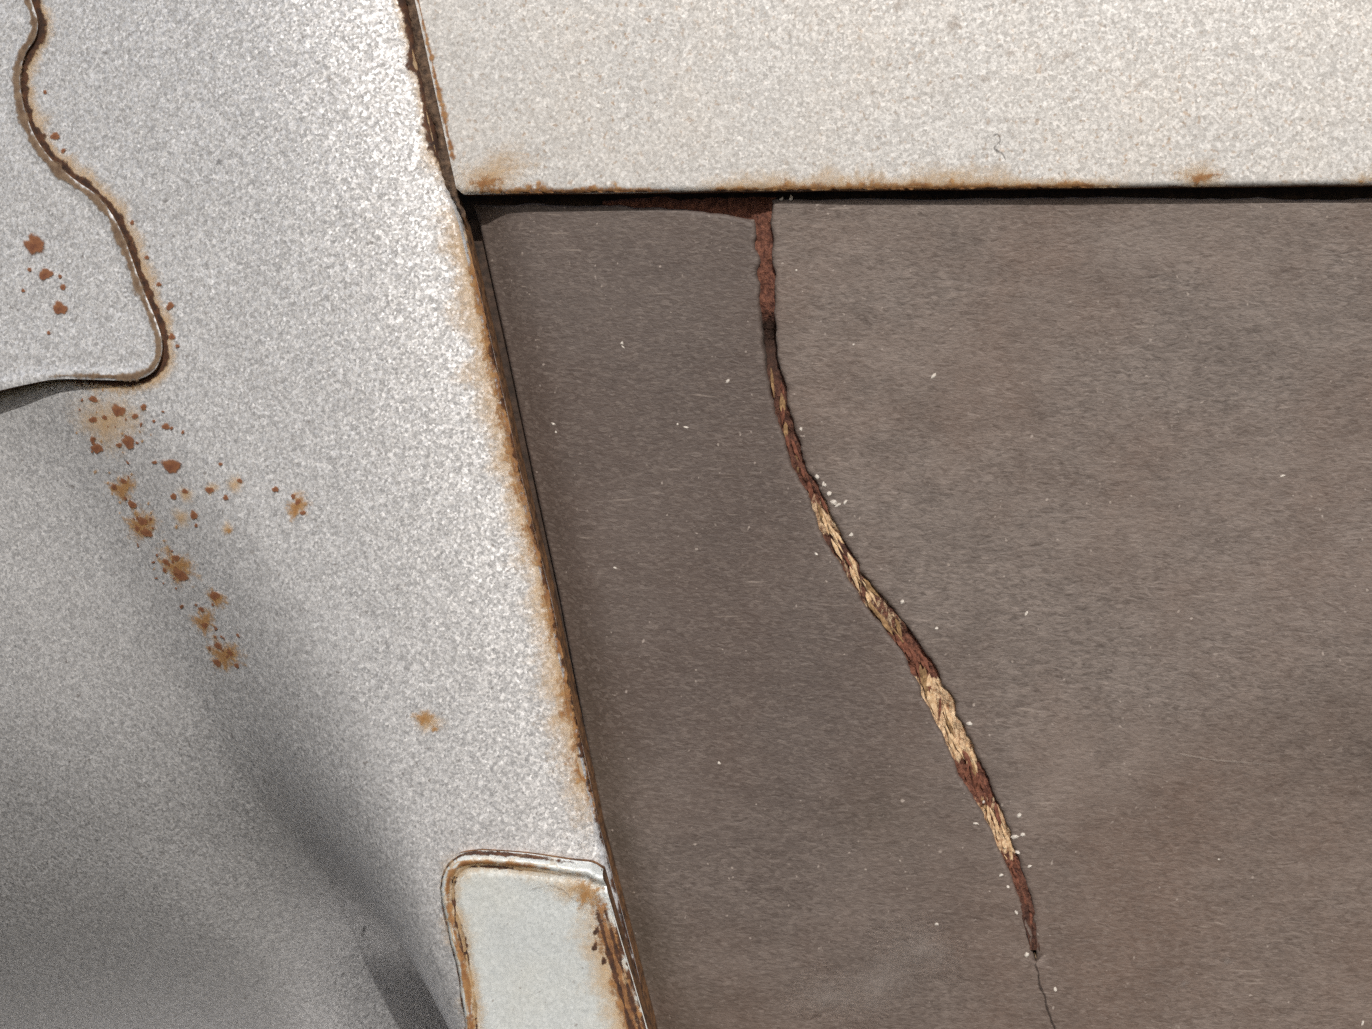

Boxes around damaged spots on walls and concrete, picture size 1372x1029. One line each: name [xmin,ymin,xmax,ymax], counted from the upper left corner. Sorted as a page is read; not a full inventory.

corrosion [470,167,674,194]
corrosion [691,173,1108,192]
corrosion [1168,173,1235,187]
corrosion [11,0,239,671]
corrosion [272,486,306,517]
corrosion [440,224,646,1029]
crack [602,195,1057,1029]
corrosion [417,713,437,731]